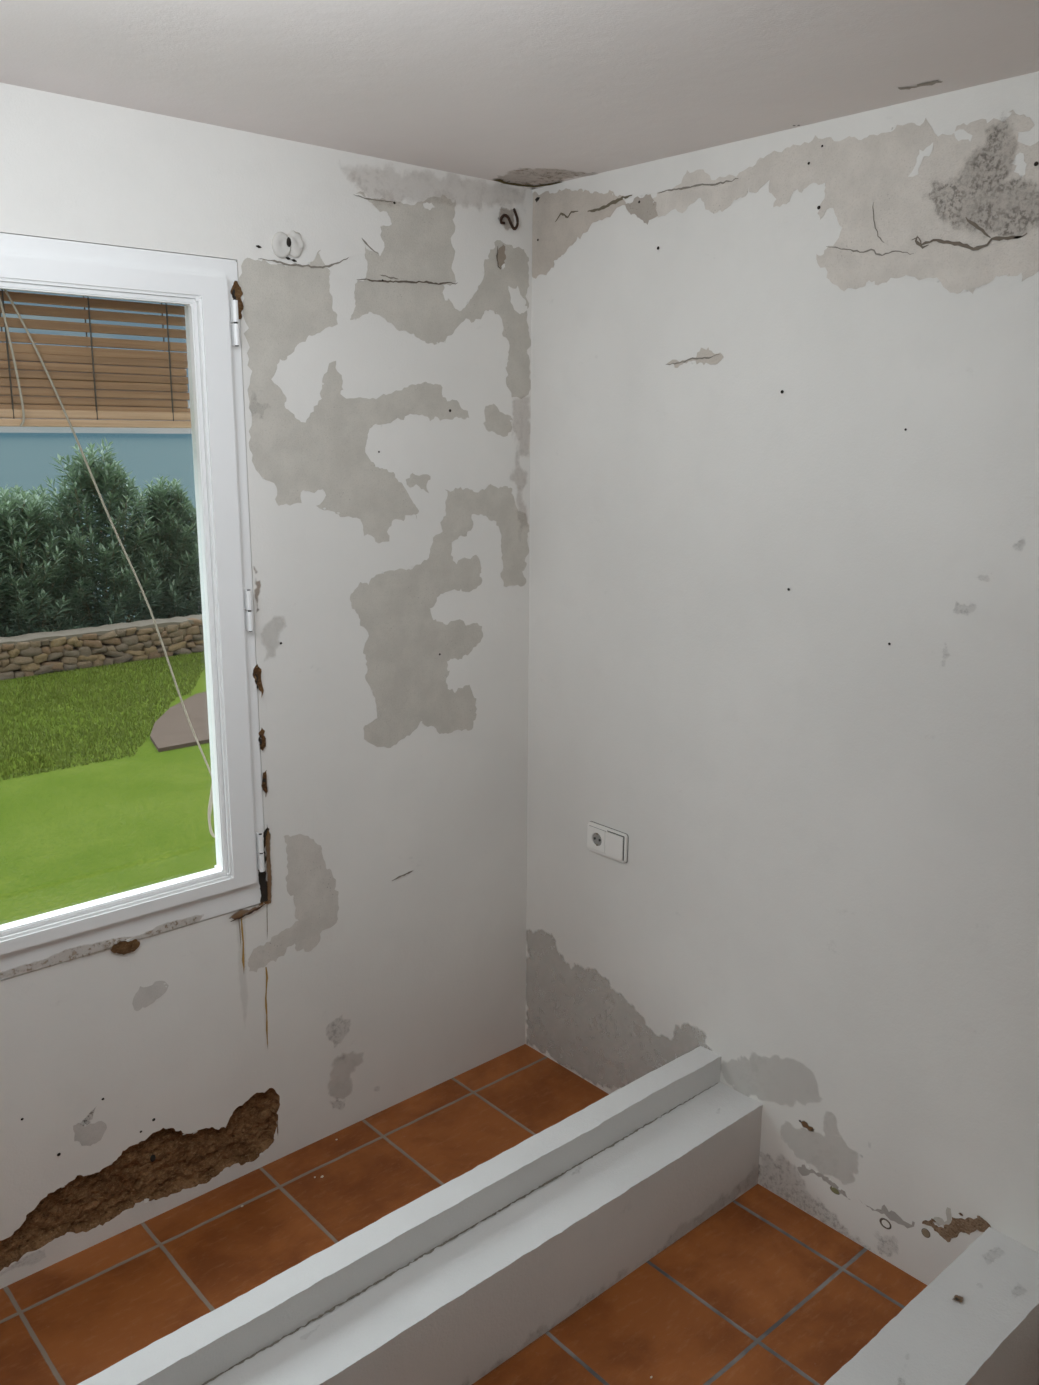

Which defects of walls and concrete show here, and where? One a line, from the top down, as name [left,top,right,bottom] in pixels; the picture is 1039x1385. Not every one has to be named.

crack [826,202,1027,256]
leakage [939,127,1039,235]
peeling [230,110,1039,751]
corrosion [229,900,269,969]
peeling [247,827,339,972]
spalling [0,1088,280,1271]
peeling [797,1165,850,1200]
spalling [866,1205,991,1242]